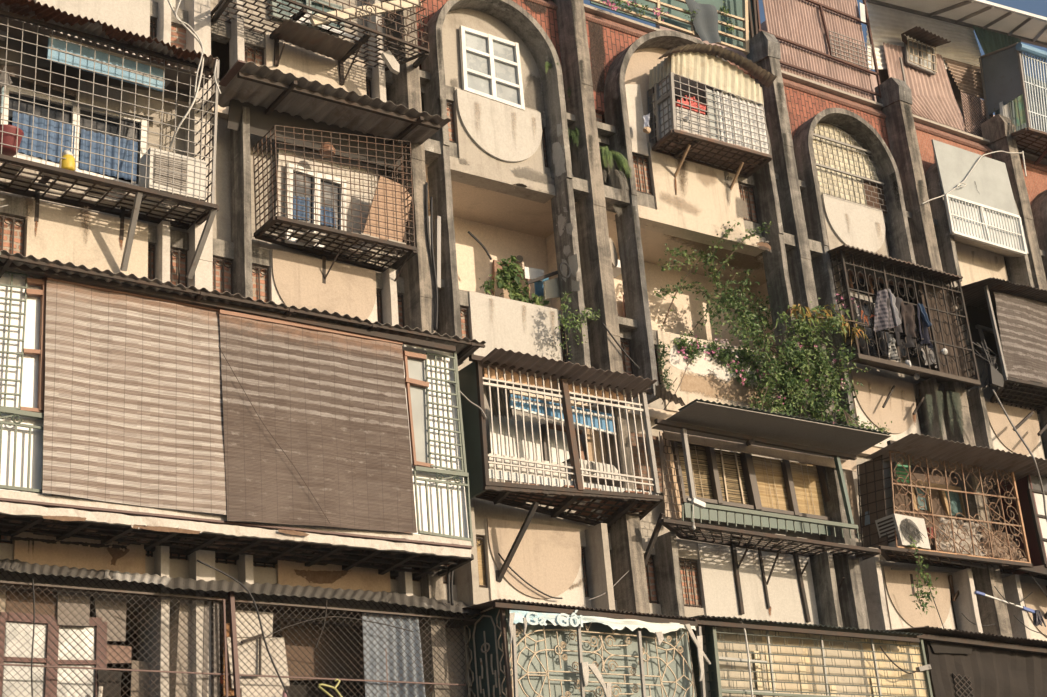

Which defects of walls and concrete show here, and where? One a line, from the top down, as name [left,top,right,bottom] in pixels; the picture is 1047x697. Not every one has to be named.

peeling [552,123,566,177]
flaking render [7,536,130,565]